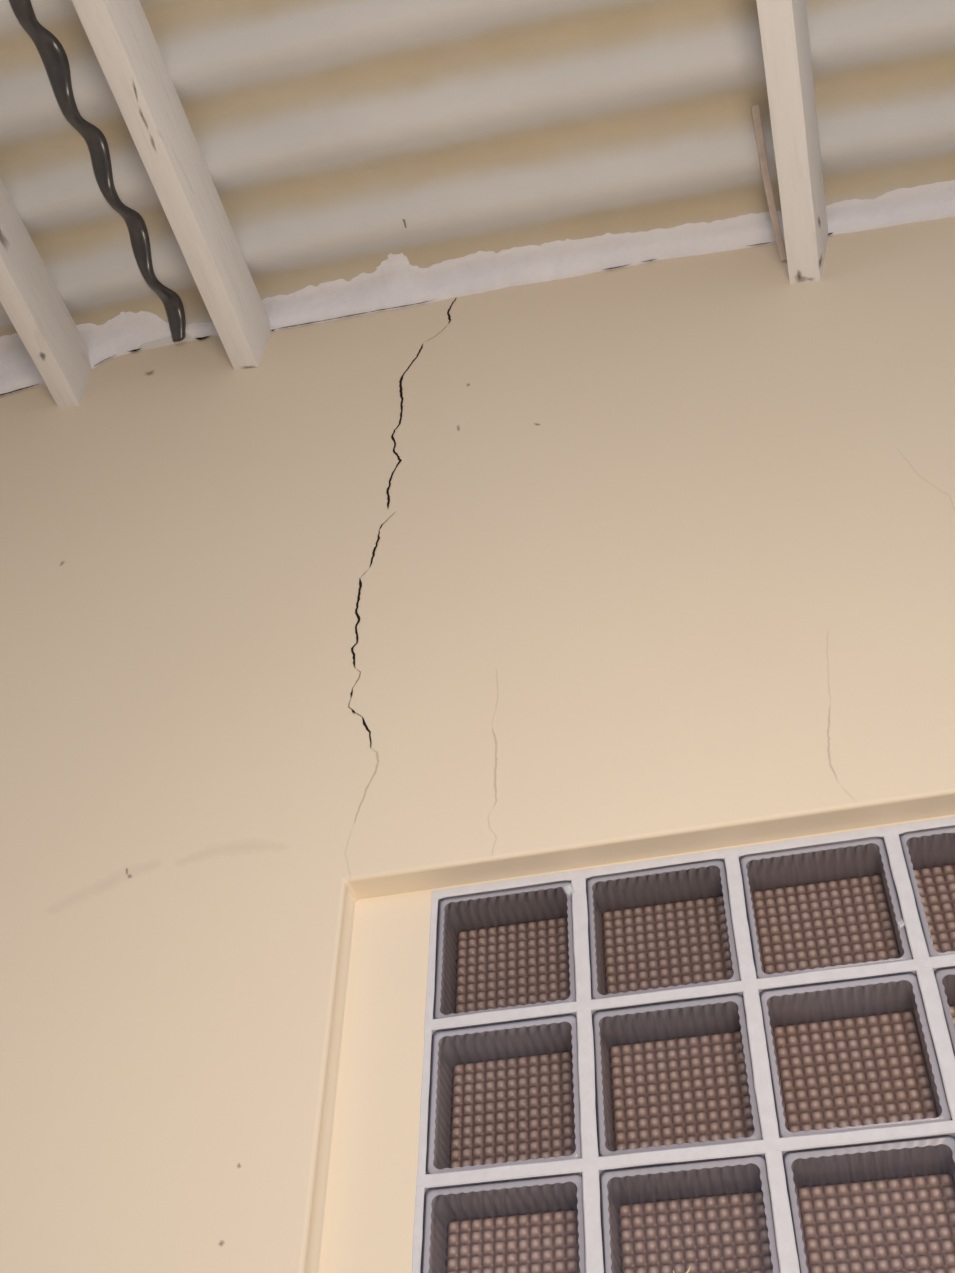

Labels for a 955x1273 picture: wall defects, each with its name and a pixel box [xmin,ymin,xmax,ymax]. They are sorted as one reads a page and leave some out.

crack [271,298,456,746]